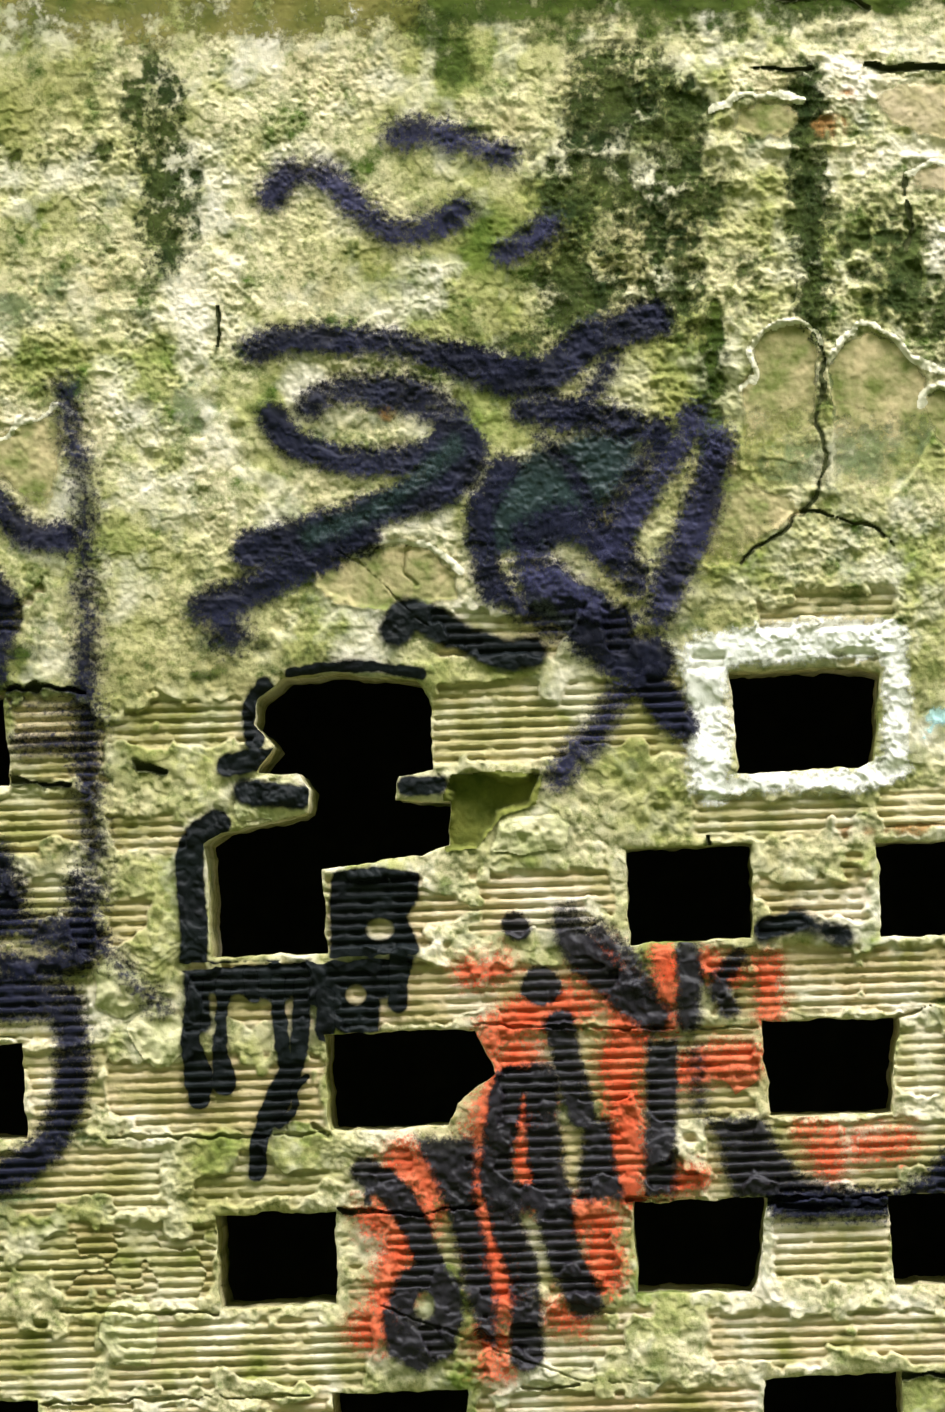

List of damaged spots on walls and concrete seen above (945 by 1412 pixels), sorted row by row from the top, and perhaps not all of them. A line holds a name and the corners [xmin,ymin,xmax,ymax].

leakage [494,40,727,456]
leakage [734,255,763,308]
leakage [784,60,945,353]
crack [740,343,892,565]
peeling [315,538,465,612]
spalling [443,770,543,852]